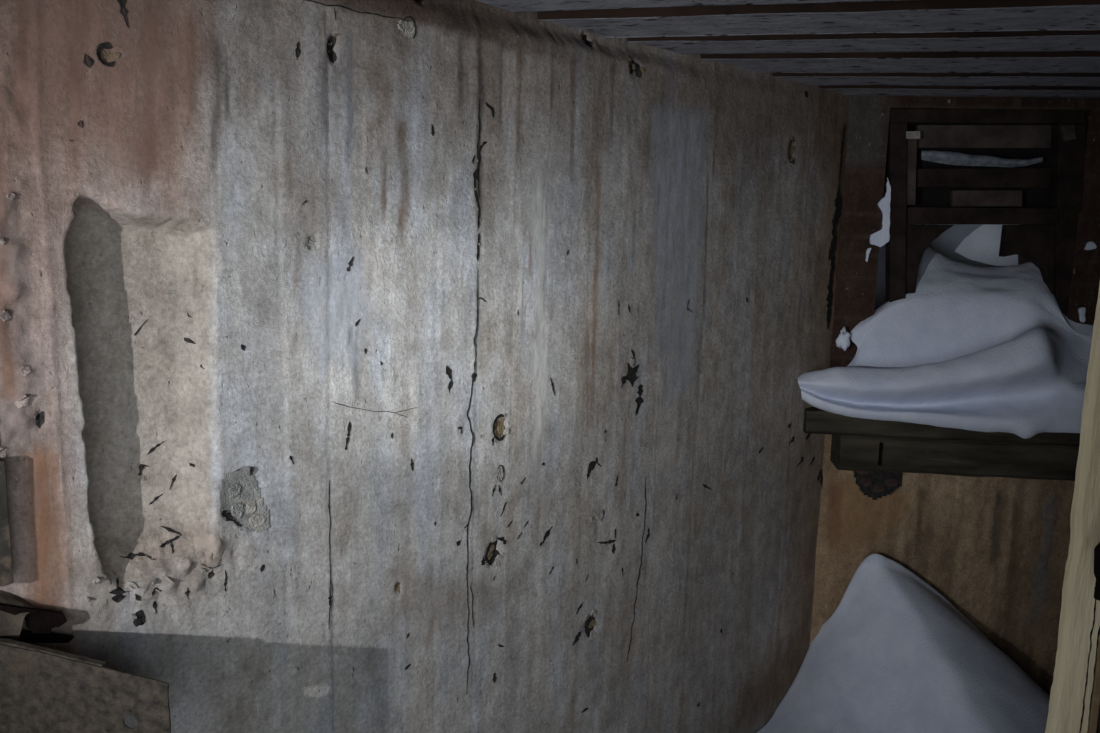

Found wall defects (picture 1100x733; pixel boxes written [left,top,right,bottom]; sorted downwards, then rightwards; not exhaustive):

spalling [83,42,121,68]
crack [826,123,845,329]
crack [464,99,495,694]
spalling [491,413,510,446]
spalling [621,349,644,416]
spalling [120,526,182,560]
spalling [220,466,269,533]
spalling [481,465,528,580]
spalling [109,576,173,627]